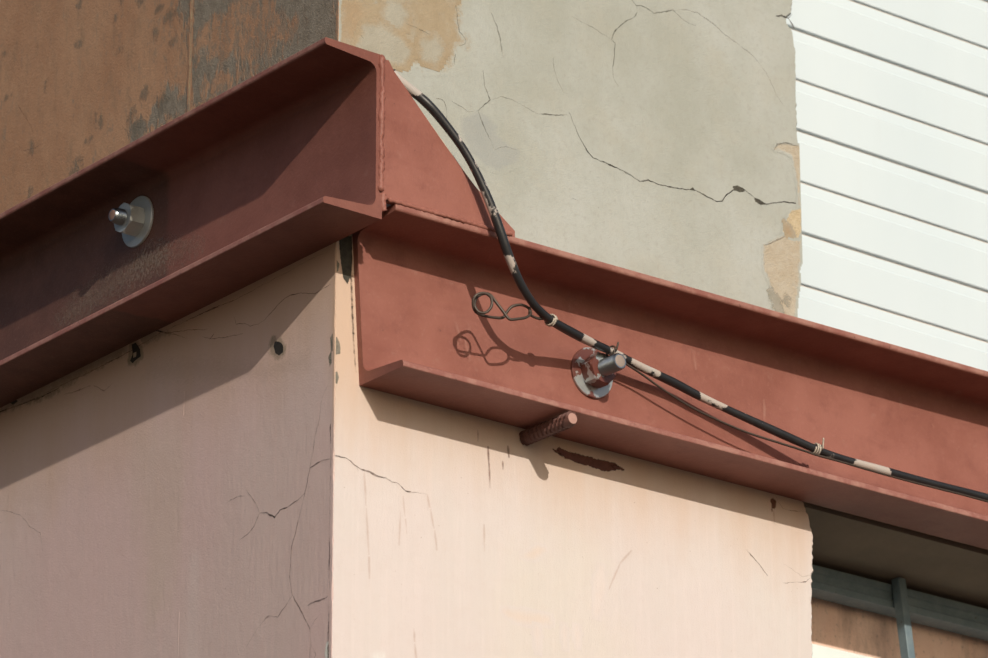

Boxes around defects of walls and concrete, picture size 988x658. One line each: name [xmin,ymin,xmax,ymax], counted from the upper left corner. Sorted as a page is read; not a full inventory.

peeling [121,0,475,147]
crack [543,113,796,205]
spalling [761,140,803,317]
crack [231,419,410,537]
crack [278,564,329,658]